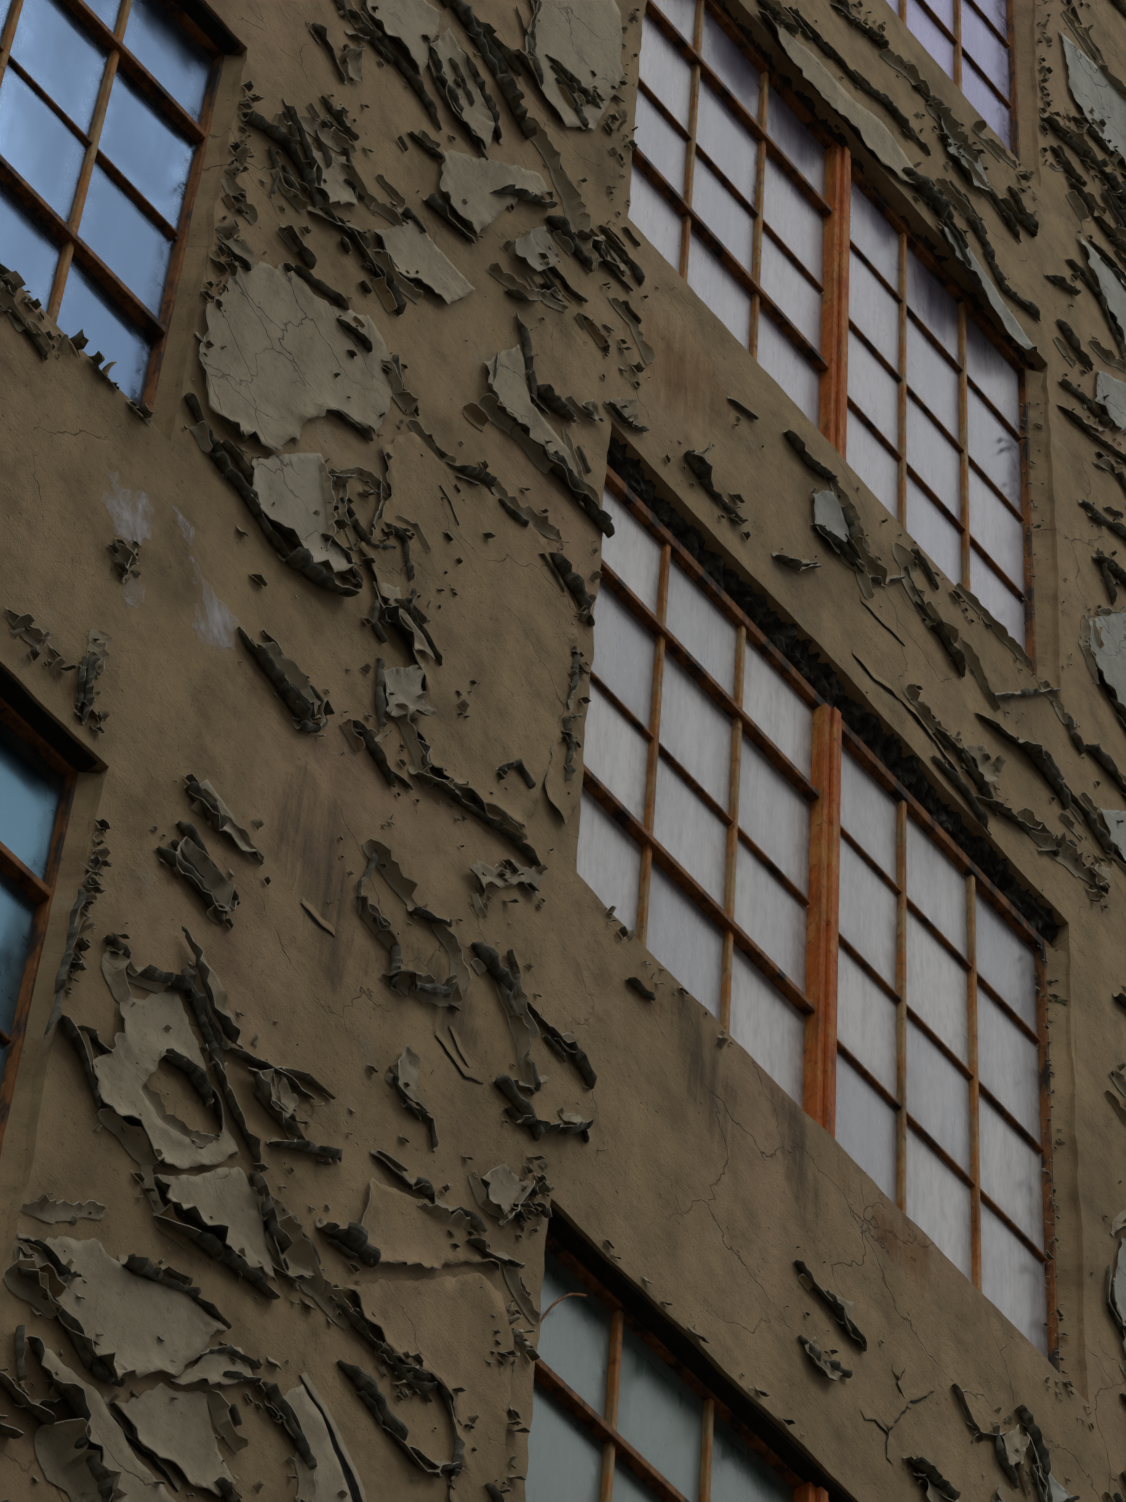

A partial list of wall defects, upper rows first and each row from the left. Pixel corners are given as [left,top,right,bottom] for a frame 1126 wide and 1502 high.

peeling [184,0,1126,1287]
peeling [150,774,271,929]
peeling [0,813,608,1502]
peeling [1091,1210,1126,1401]
crack [861,1358,935,1465]
peeling [902,1454,961,1502]
peeling [952,1383,1080,1502]